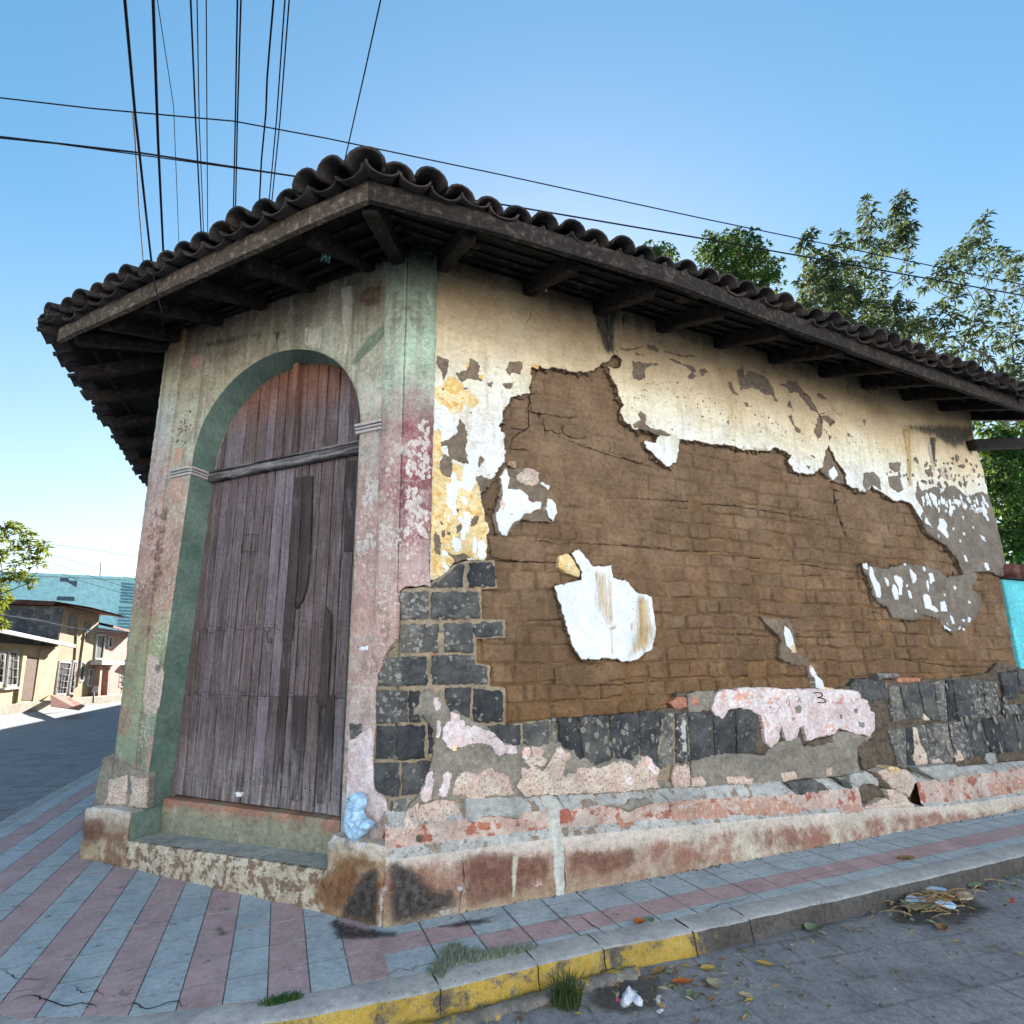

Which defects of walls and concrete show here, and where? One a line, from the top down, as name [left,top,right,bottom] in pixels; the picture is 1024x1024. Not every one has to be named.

crack [509,393,535,450]
crack [559,437,649,466]
crack [496,530,772,563]
flaking render [356,344,1016,748]
crack [615,486,986,668]
peeling [402,697,706,843]
peeling [724,775,753,785]
peeling [780,771,798,782]
peeling [671,799,801,821]
damp [332,863,488,939]